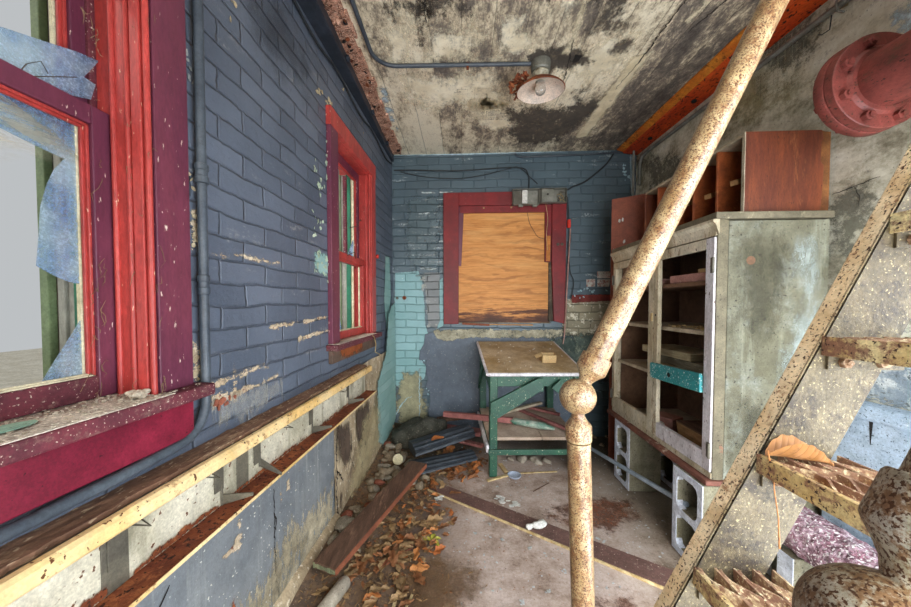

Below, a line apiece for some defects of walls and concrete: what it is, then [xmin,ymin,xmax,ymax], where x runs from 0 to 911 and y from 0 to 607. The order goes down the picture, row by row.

water stain [765,13,823,73]
water stain [383,0,640,147]
peeling [314,250,329,283]
peeling [269,316,328,343]
peeling [377,191,564,444]
spalling [211,364,279,411]
water stain [338,401,380,508]